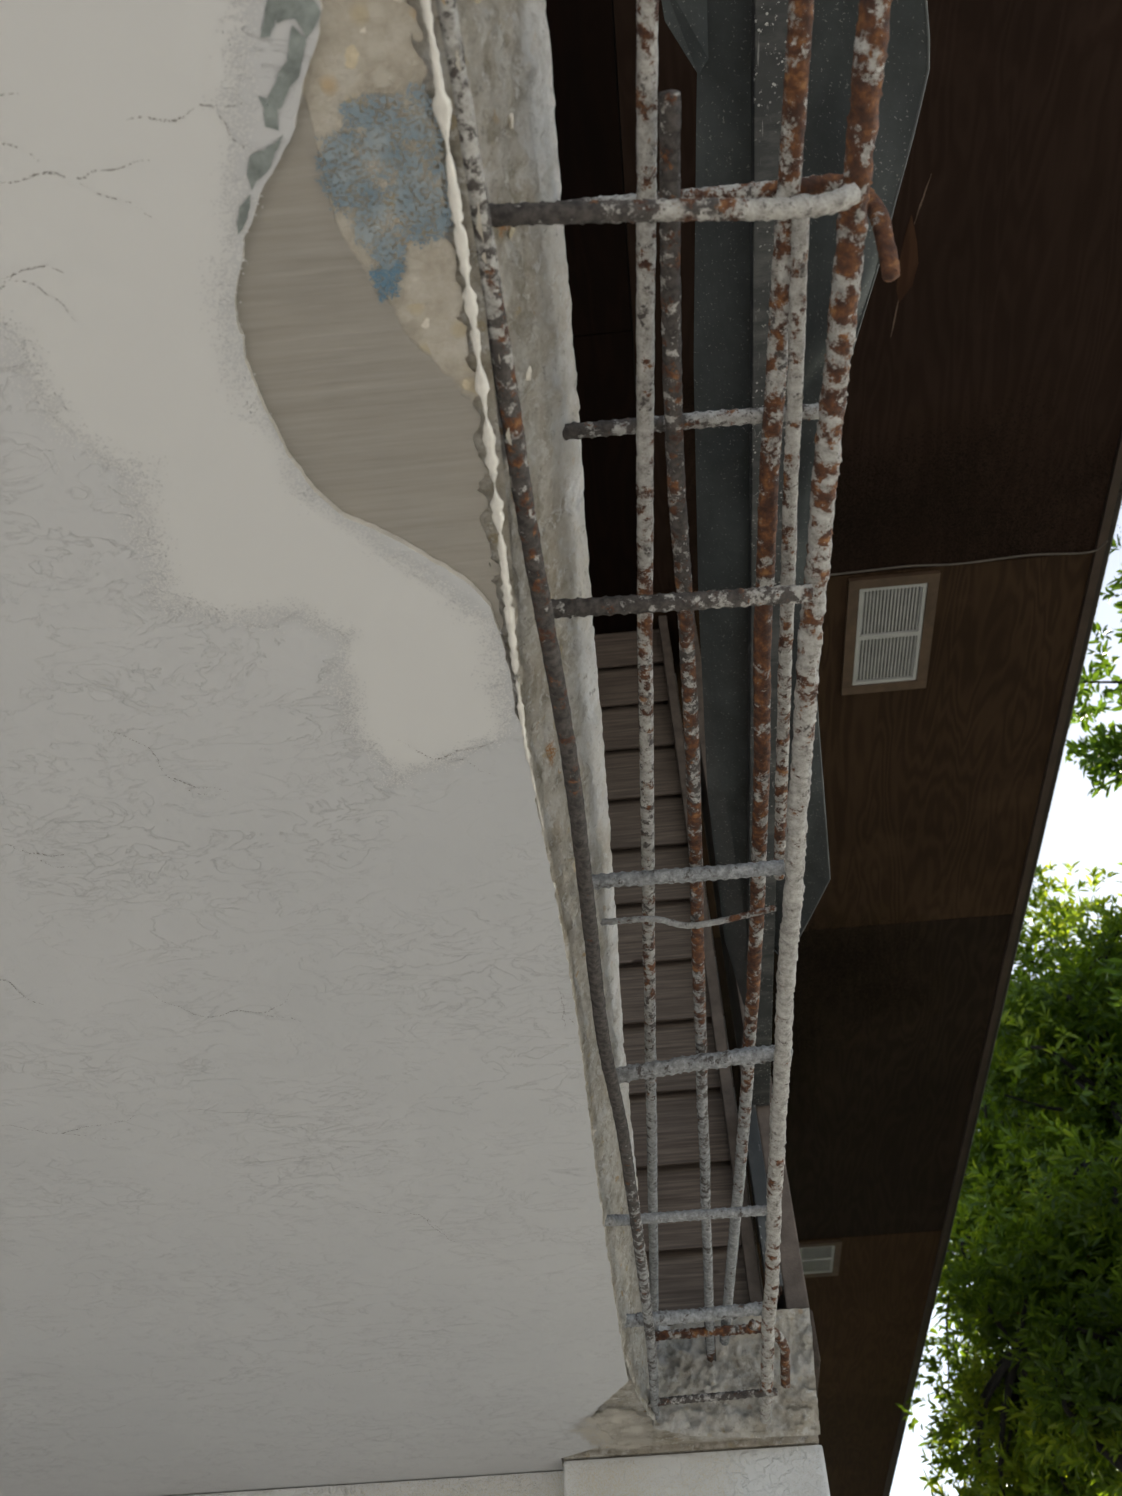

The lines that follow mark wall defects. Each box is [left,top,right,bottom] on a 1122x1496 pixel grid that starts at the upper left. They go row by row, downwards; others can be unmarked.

peeling [236,0,820,1453]
crack [914,174,932,224]